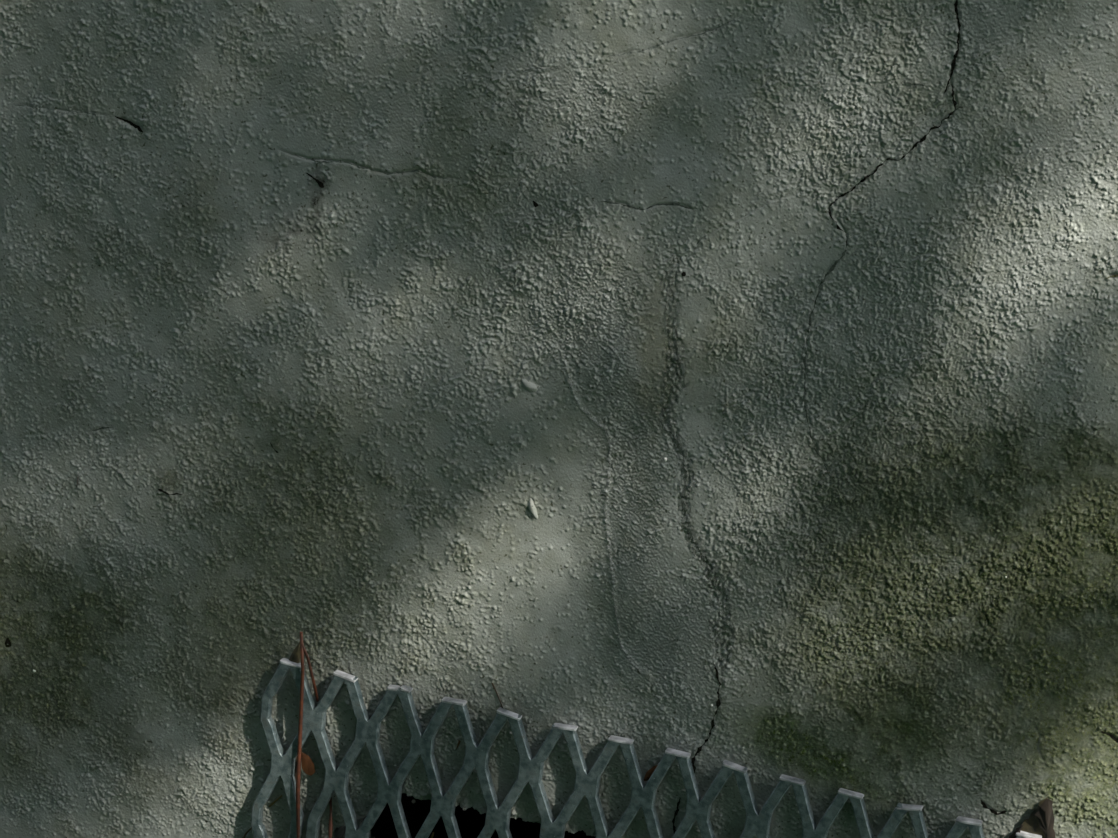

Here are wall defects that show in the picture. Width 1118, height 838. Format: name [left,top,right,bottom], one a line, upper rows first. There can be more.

crack [601,201,693,210]
crack [796,0,961,476]
crack [660,267,734,773]
crack [672,798,681,834]